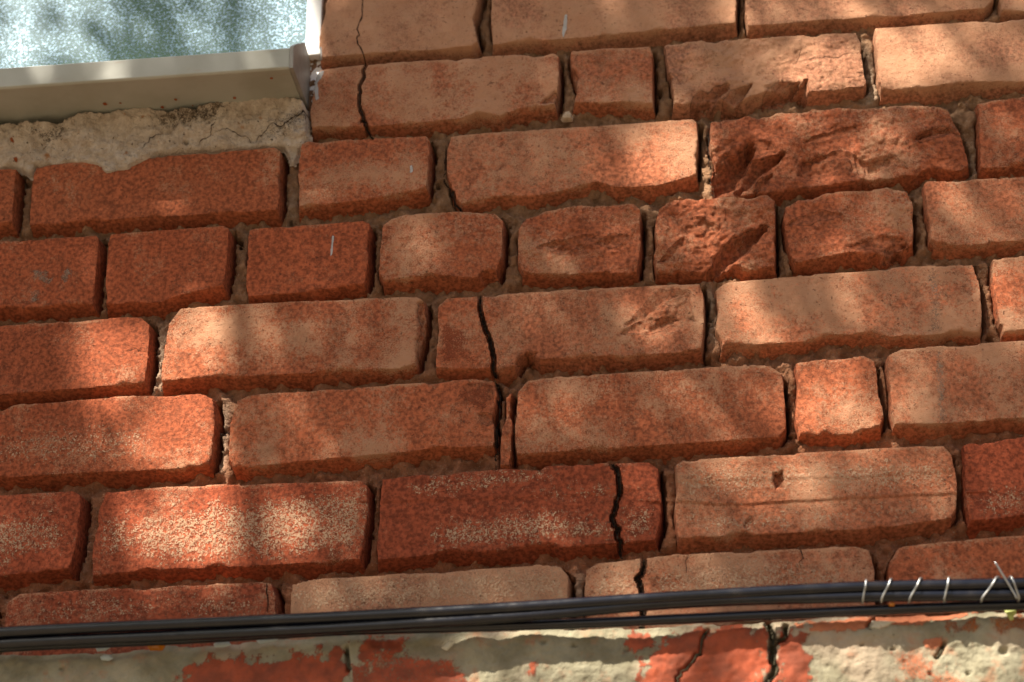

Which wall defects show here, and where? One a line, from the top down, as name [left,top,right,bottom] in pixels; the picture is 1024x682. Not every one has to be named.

crack [356,0,374,140]
crack [199,110,309,143]
spalling [799,127,908,179]
spalling [912,126,955,143]
spalling [658,139,786,281]
crack [479,296,501,470]
crack [610,464,646,627]
peeling [176,635,468,682]
crack [767,624,788,682]
peeling [624,612,978,682]